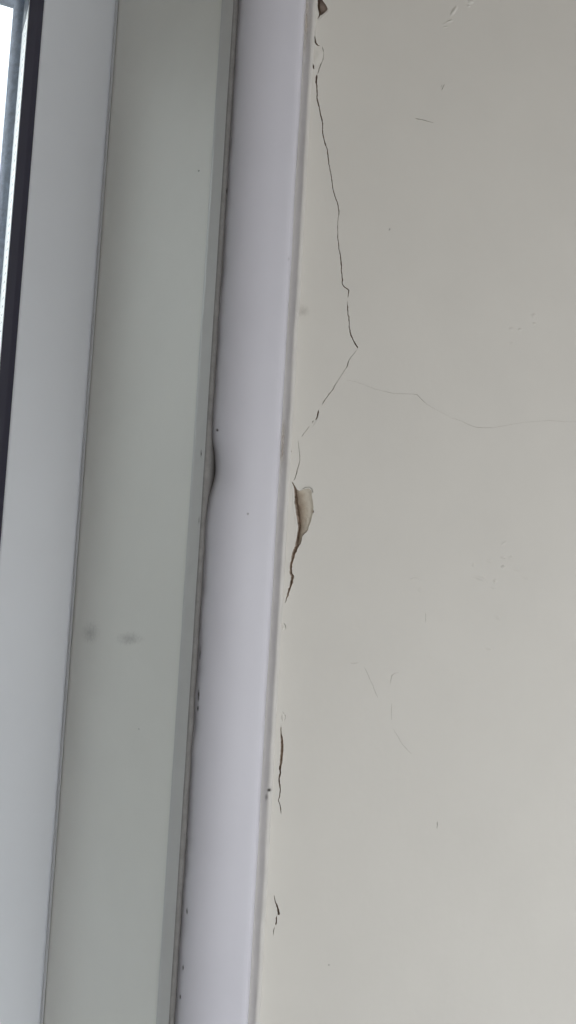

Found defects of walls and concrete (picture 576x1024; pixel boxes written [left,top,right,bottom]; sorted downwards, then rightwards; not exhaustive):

crack [293,75,562,481]
flaking render [290,482,315,544]
crack [285,544,300,602]
crack [277,728,285,811]